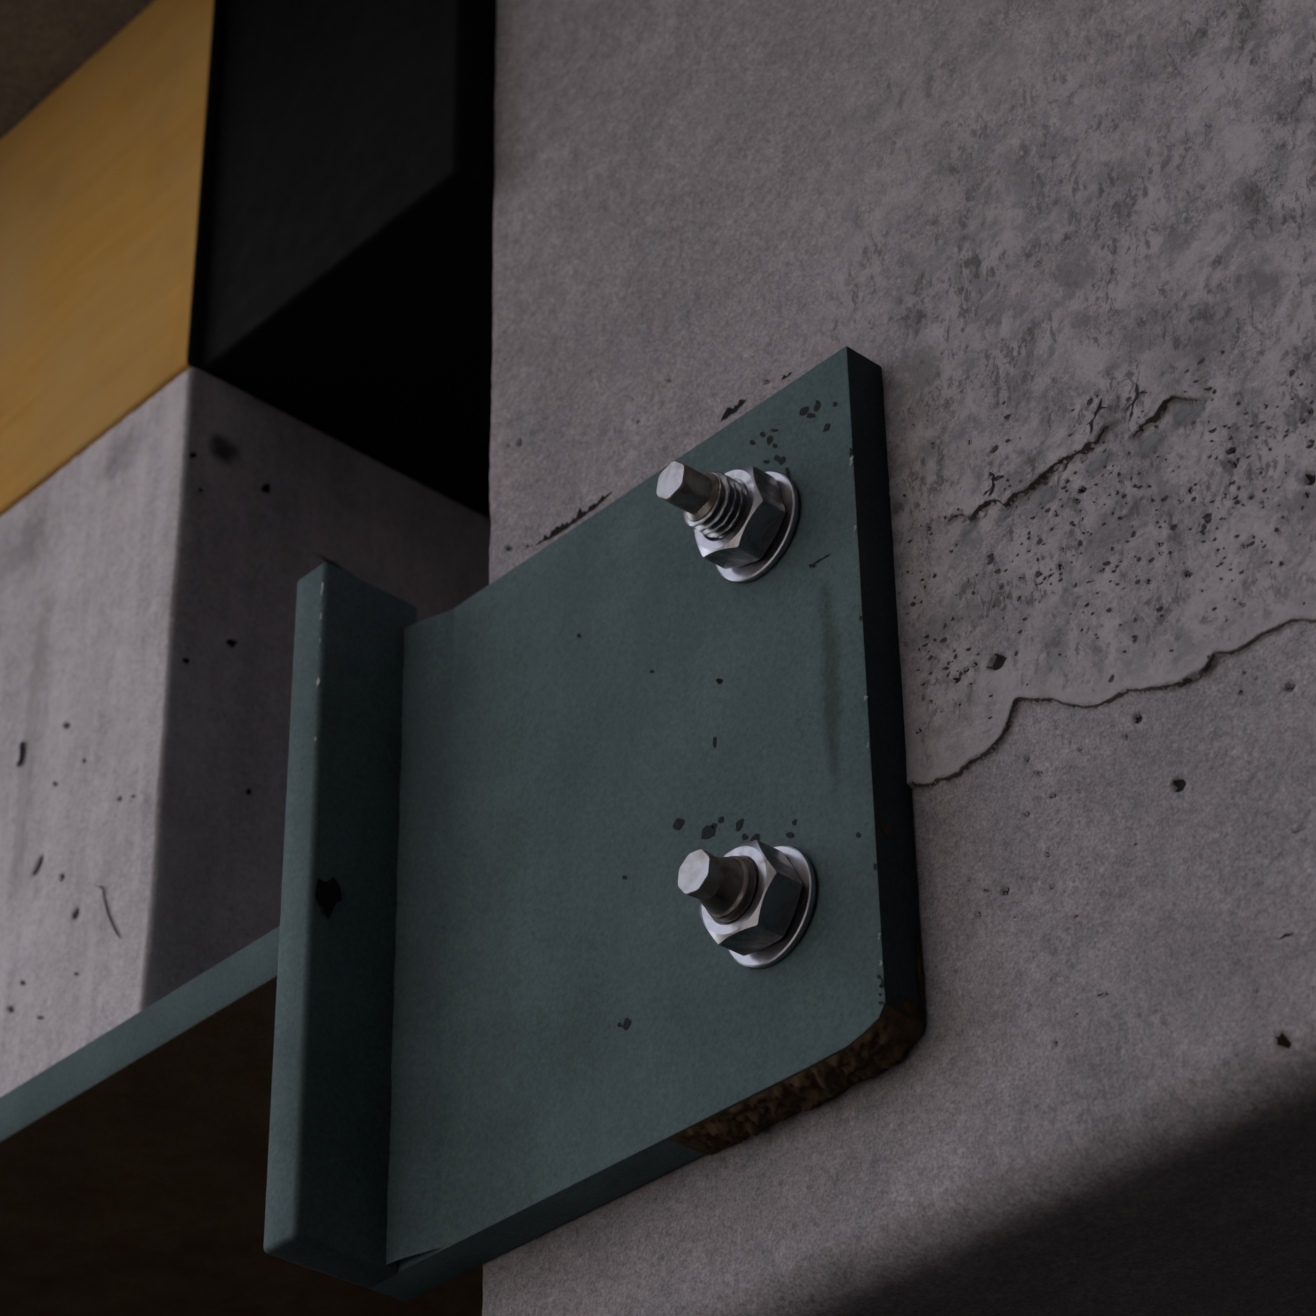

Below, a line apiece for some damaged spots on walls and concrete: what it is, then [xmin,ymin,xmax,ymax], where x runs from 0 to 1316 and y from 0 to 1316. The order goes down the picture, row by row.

crack [1085,382,1148,434]
crack [983,472,1003,496]
spalling [948,425,1111,535]
spalling [911,618,1316,788]
spalling [1173,779,1186,792]